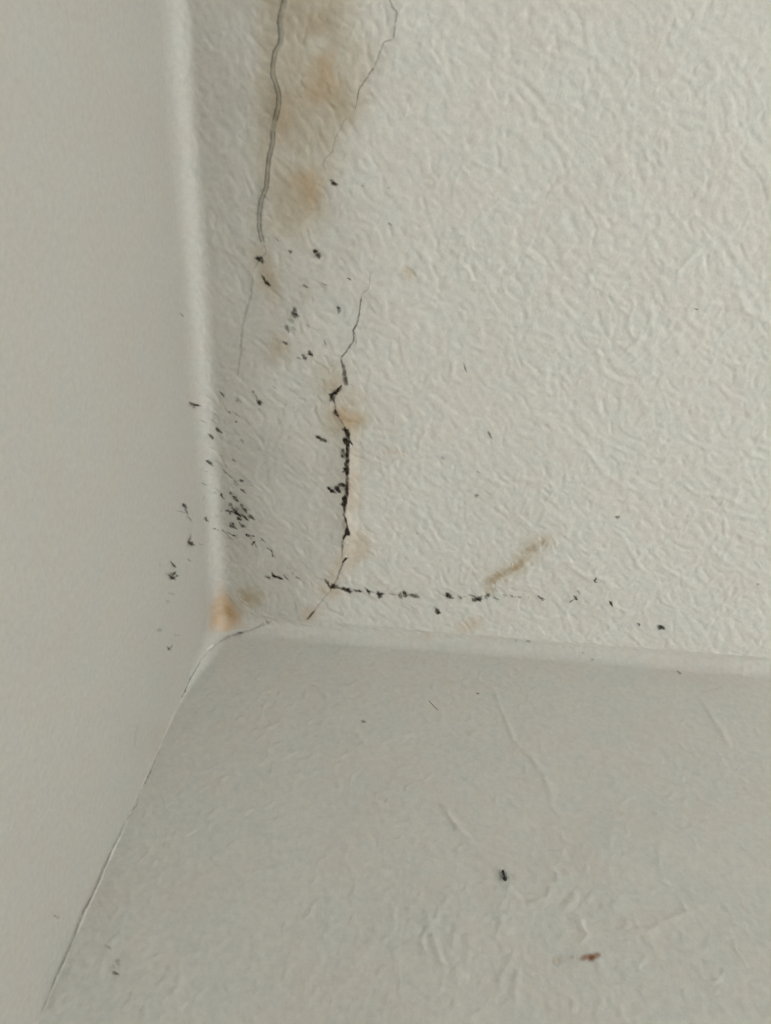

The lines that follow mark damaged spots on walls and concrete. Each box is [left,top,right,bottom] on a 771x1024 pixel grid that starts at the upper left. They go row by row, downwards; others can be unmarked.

damp [220,490,273,557]
damp [236,0,409,626]
crack [318,299,362,566]
damp [446,525,562,635]